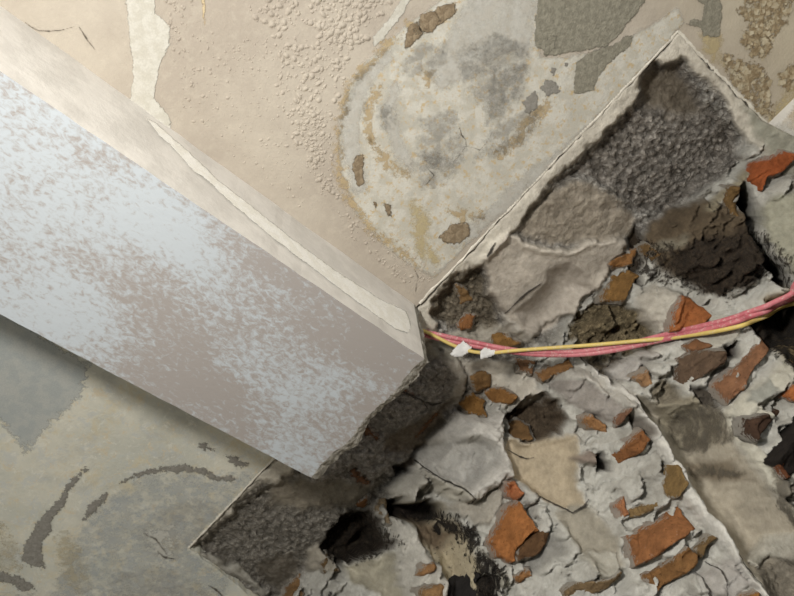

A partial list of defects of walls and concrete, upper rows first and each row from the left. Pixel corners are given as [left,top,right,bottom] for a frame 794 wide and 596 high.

peeling [125,0,411,333]
leakage [332,0,684,277]
spalling [188,0,794,596]
leakage [744,225,794,291]
spalling [22,466,89,569]
spalling [82,492,108,521]
spalling [119,455,249,484]
spalling [0,571,35,592]